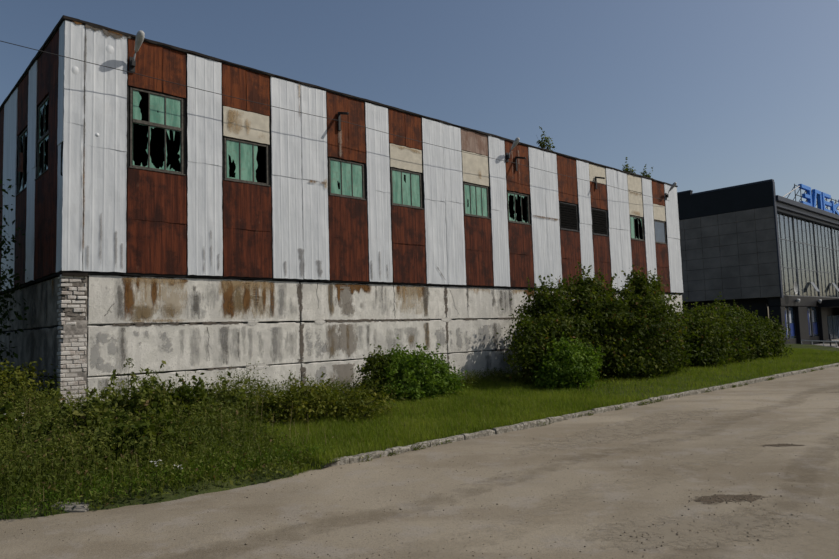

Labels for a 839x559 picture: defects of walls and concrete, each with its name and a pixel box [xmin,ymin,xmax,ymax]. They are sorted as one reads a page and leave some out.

rust [123,277,188,322]
rust [220,281,274,318]
rust [335,284,370,301]